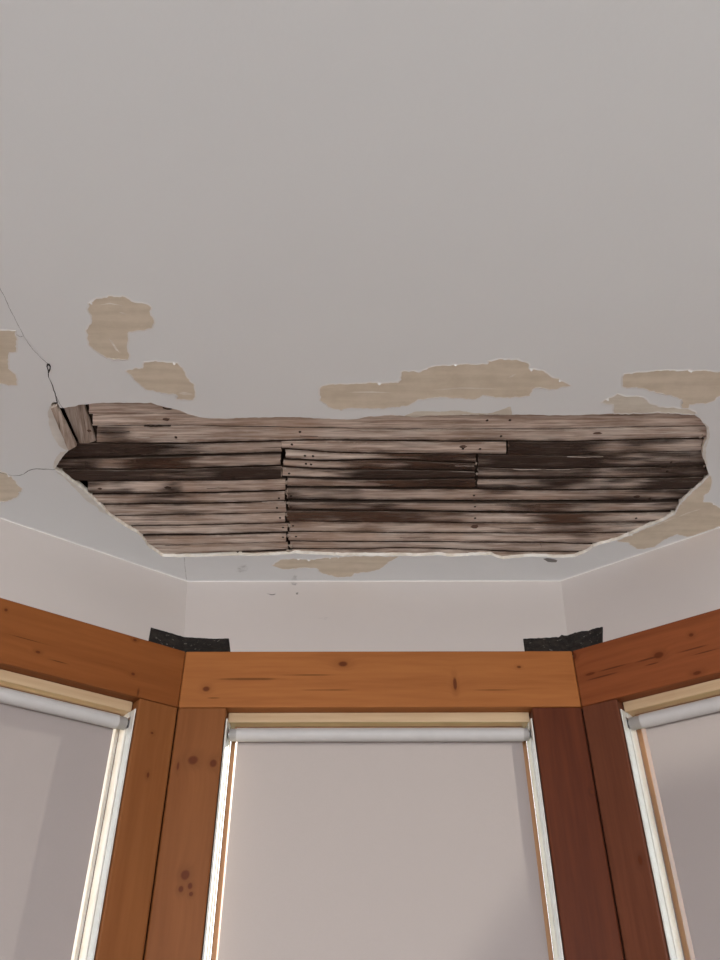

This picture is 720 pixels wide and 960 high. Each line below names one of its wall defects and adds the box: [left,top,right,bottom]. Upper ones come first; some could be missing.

peeling [0,329,19,386]
crack [0,289,63,408]
peeling [0,471,23,502]
spalling [48,295,720,578]